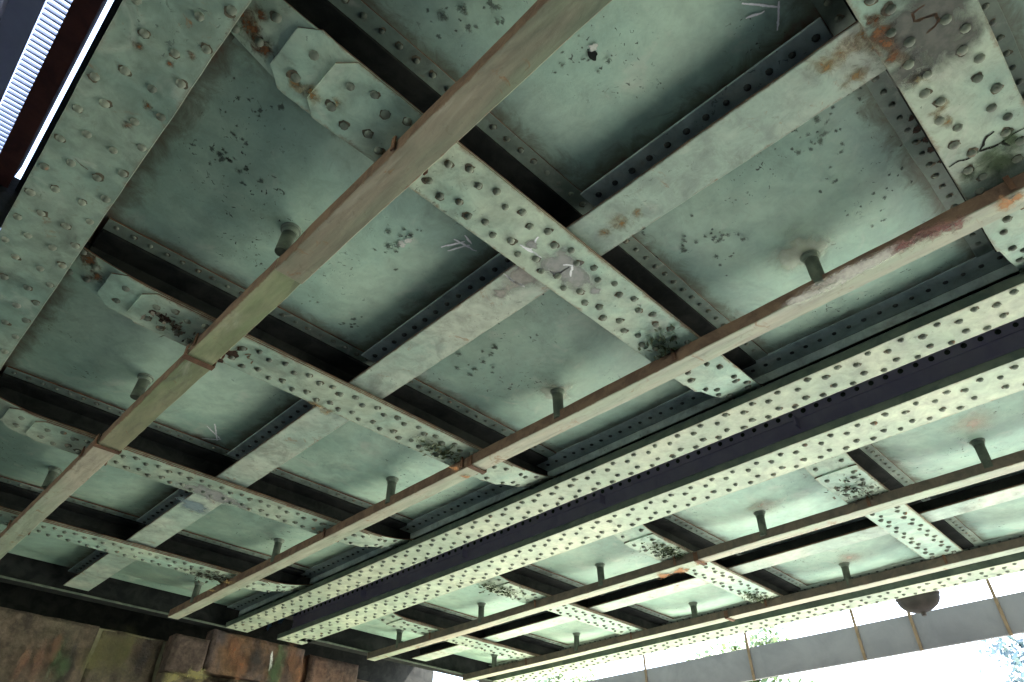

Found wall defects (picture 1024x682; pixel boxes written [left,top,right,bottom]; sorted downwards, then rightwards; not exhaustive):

corrosion [240,5,274,57]
corrosion [815,14,906,73]
crack [949,128,1024,168]
peeling [494,241,601,298]
corrosion [148,310,183,331]